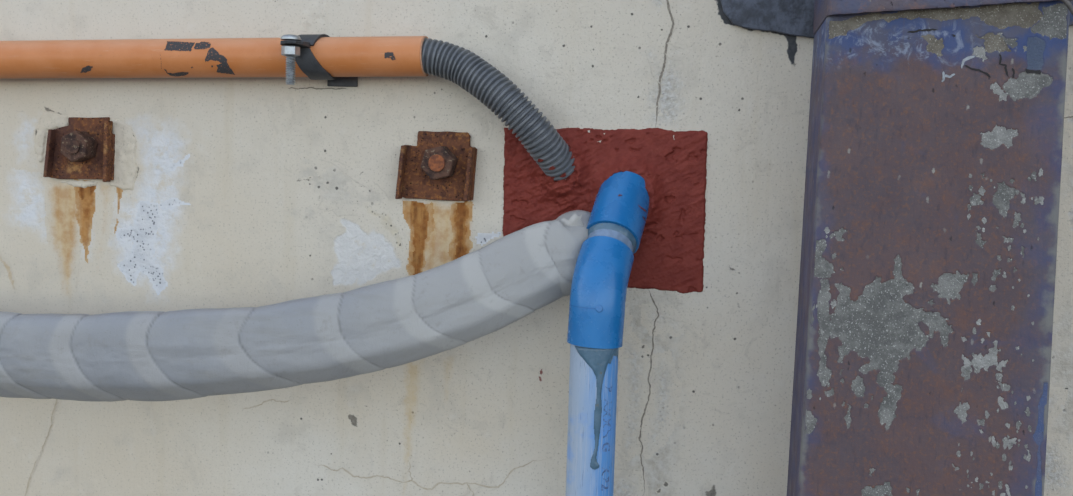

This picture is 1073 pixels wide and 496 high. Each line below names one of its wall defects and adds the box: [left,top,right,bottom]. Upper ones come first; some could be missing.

crack [646,0,683,128]
rust [43,177,123,303]
peeling [327,202,405,291]
rust [398,197,477,277]
peeling [805,2,1073,496]
crack [614,291,687,495]